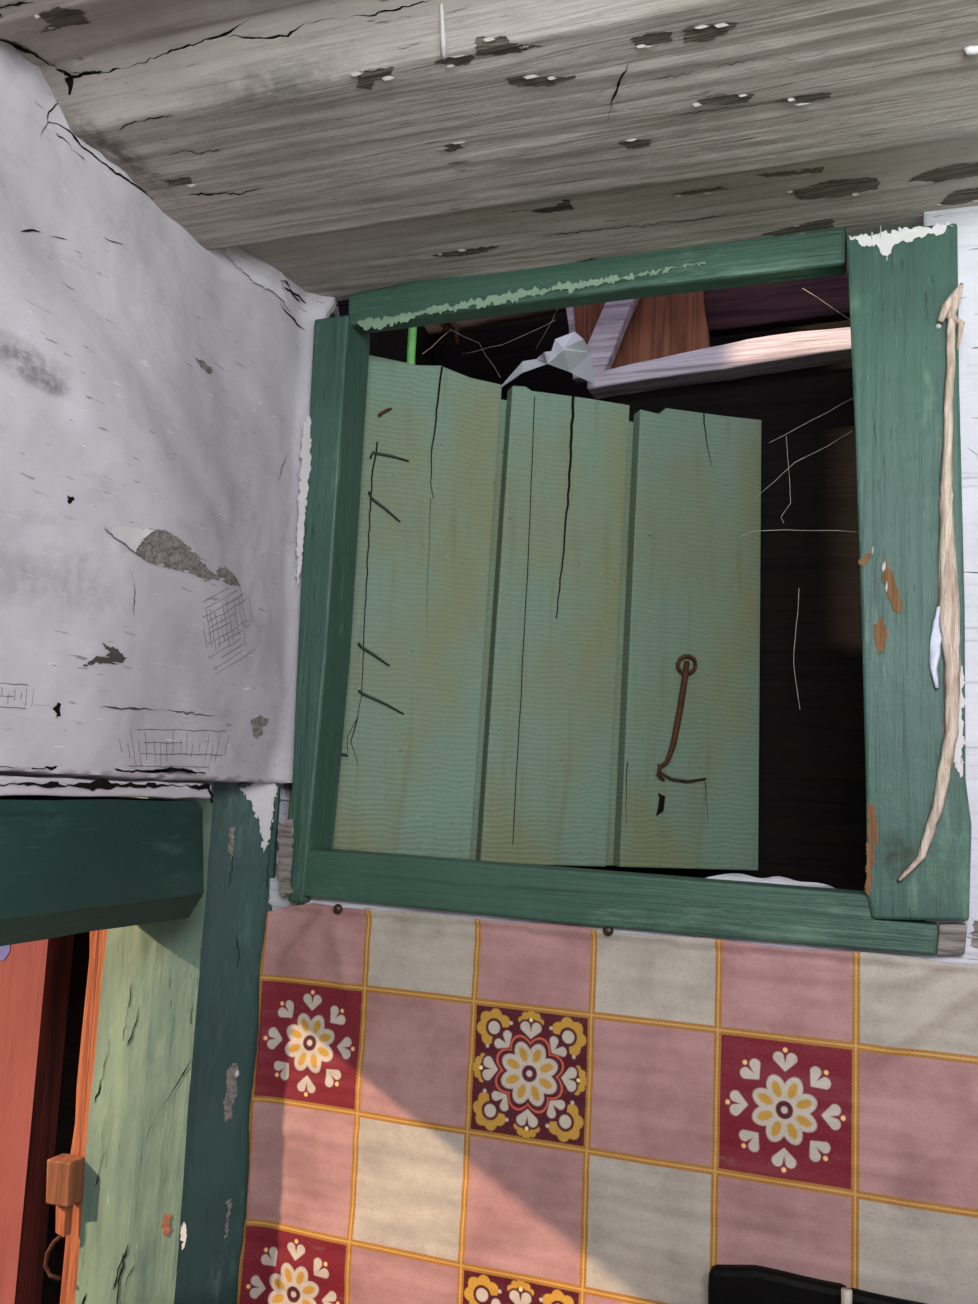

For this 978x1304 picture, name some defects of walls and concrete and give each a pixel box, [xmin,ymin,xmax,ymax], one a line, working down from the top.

crack [0,0,430,200]
peeling [105,525,240,586]